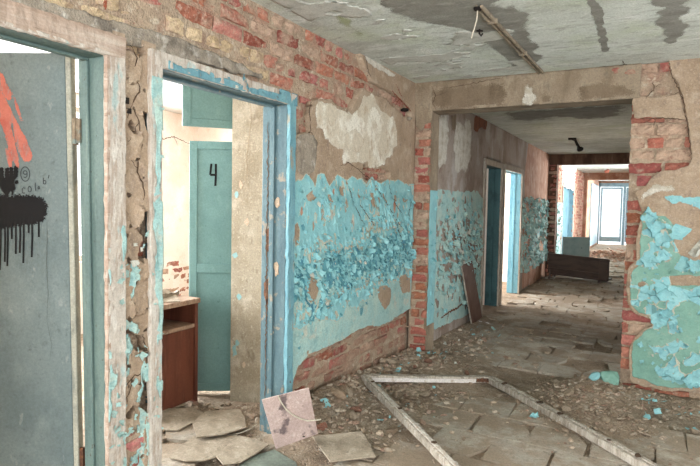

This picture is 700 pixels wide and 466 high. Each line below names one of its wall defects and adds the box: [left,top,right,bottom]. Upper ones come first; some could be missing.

damp [380,0,543,66]
damp [586,0,610,52]
damp [651,0,691,44]
crack [127,45,145,214]
peeling [108,76,189,345]
peeling [162,0,484,392]
damp [431,81,635,173]
peeling [520,165,563,275]
flaking render [628,105,691,186]
crack [641,63,691,156]
peeling [620,200,700,397]
peeling [109,317,163,466]